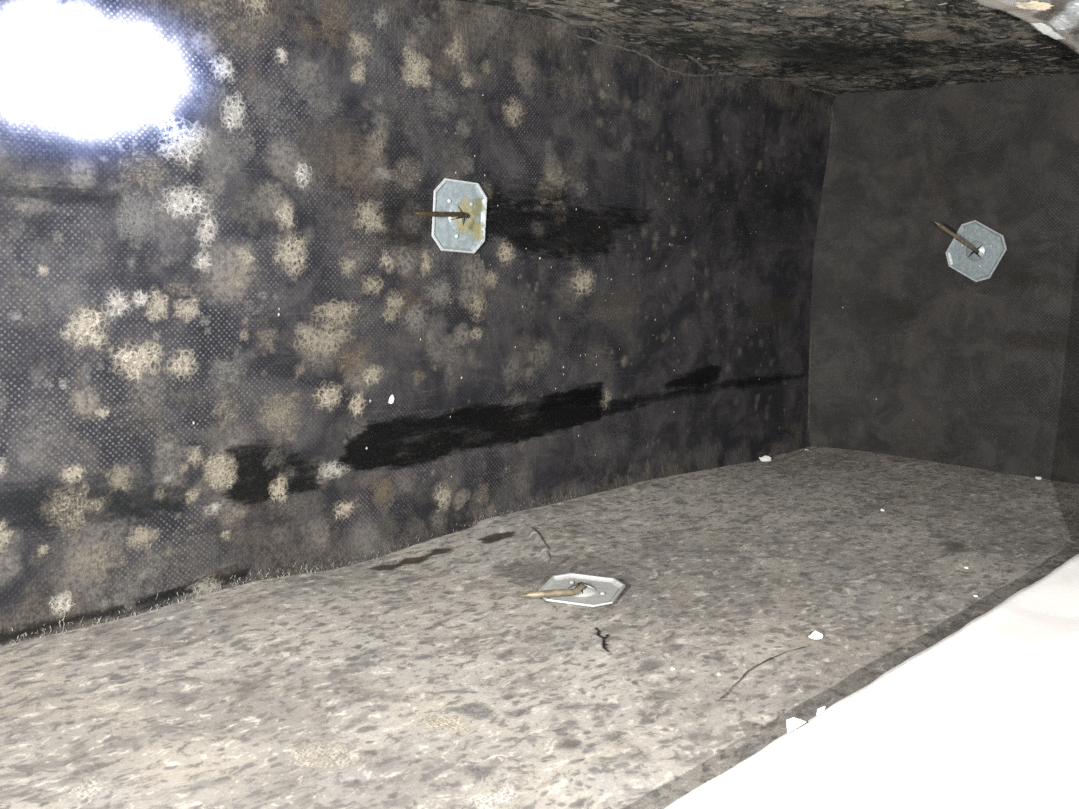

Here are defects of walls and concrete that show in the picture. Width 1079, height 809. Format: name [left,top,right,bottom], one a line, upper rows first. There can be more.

mould [403,36,486,126]
mould [117,57,282,269]
mould [235,191,304,274]
mould [295,132,418,232]
water stain [486,171,647,262]
mould [59,284,210,348]
mould [114,334,199,409]
water stain [297,303,378,382]
water stain [364,279,447,329]
water stain [181,365,796,538]
water stain [0,466,198,549]
mould [50,594,73,612]